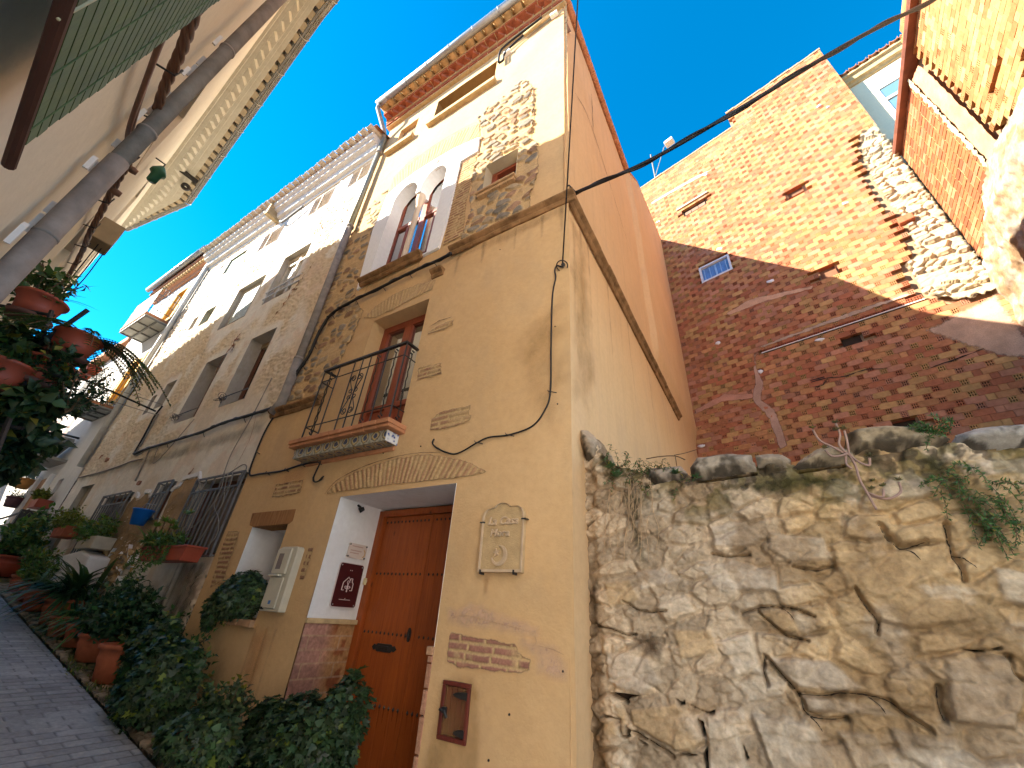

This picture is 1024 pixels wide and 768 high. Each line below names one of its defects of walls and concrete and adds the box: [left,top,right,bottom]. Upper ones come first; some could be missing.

flaking render [447,633,530,673]